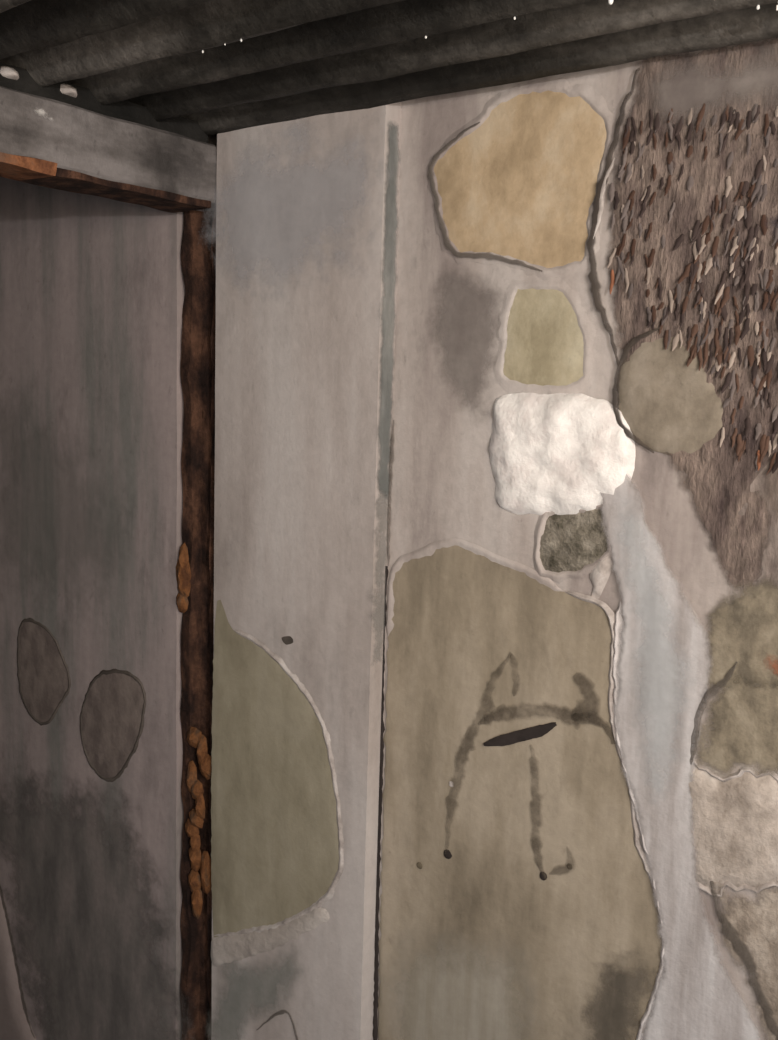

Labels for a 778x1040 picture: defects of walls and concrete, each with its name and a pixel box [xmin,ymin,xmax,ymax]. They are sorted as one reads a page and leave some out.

corrosion [176,543,191,613]
peeling [427,37,778,1040]
damp [0,779,178,1040]
corrosion [185,727,212,919]
spalling [211,600,344,967]
spalling [378,504,662,1040]